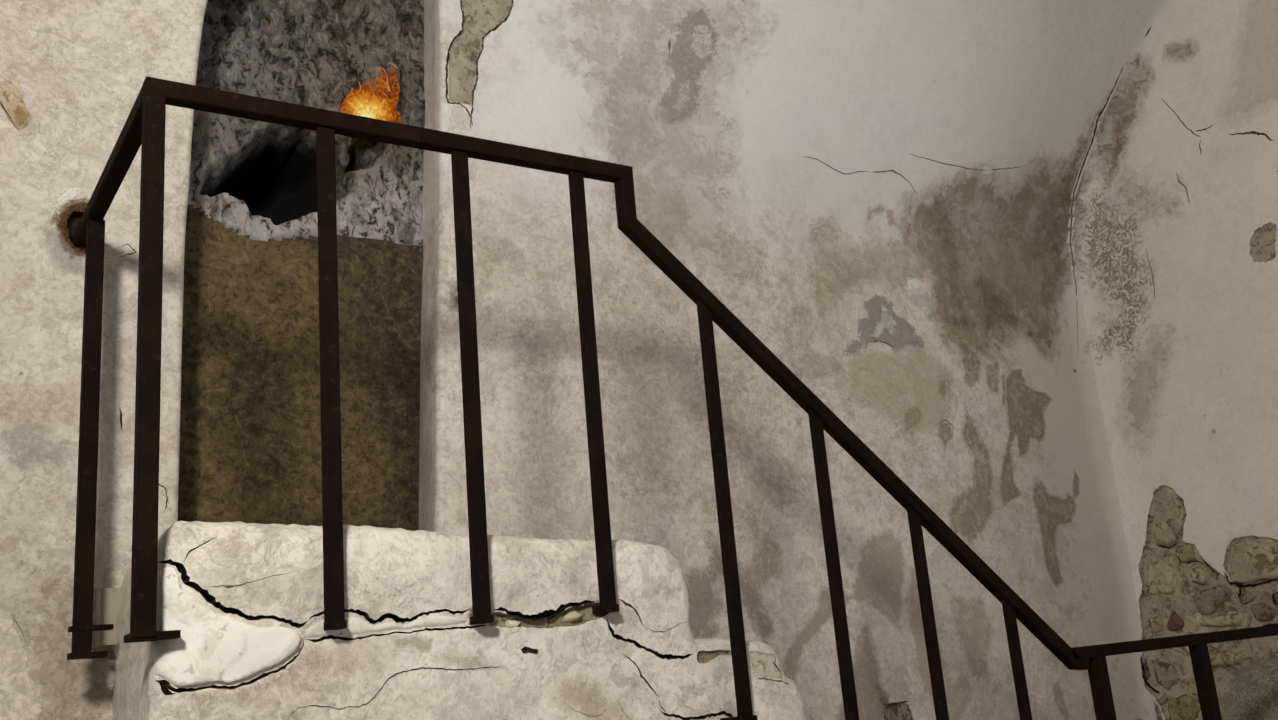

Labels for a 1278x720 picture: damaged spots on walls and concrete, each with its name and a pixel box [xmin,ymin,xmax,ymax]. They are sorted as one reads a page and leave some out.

flaking render [0,81,31,130]
corrosion [52,187,88,271]
flaking render [445,0,514,129]
crack [803,154,1025,193]
water stain [868,57,1152,387]
crack [1070,67,1123,349]
crack [1161,98,1274,156]
flaking render [1249,222,1277,263]
water stain [951,371,1051,539]
water stain [1034,474,1079,586]
crack [155,538,733,720]
spalling [1139,485,1278,720]